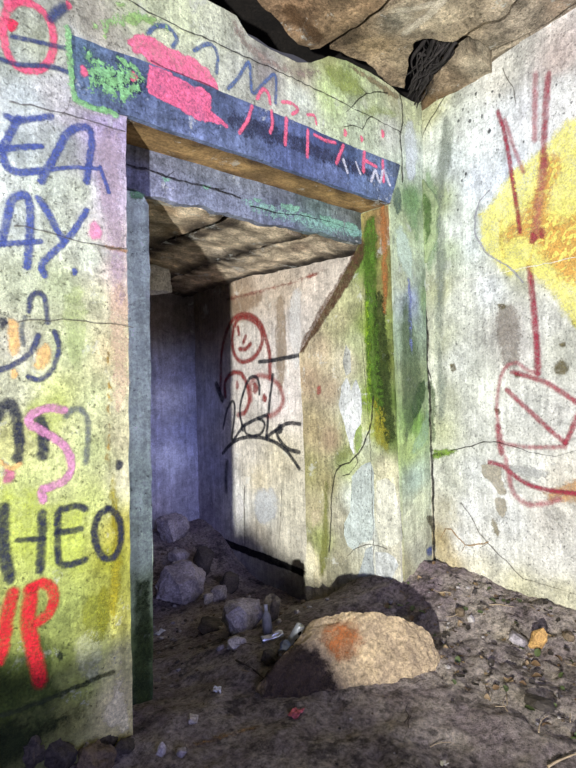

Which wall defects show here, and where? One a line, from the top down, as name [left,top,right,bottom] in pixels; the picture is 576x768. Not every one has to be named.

crack [129,0,445,182]
damp [405,121,416,178]
damp [427,125,452,199]
damp [363,209,456,449]
crack [328,344,387,568]
crack [426,313,576,595]